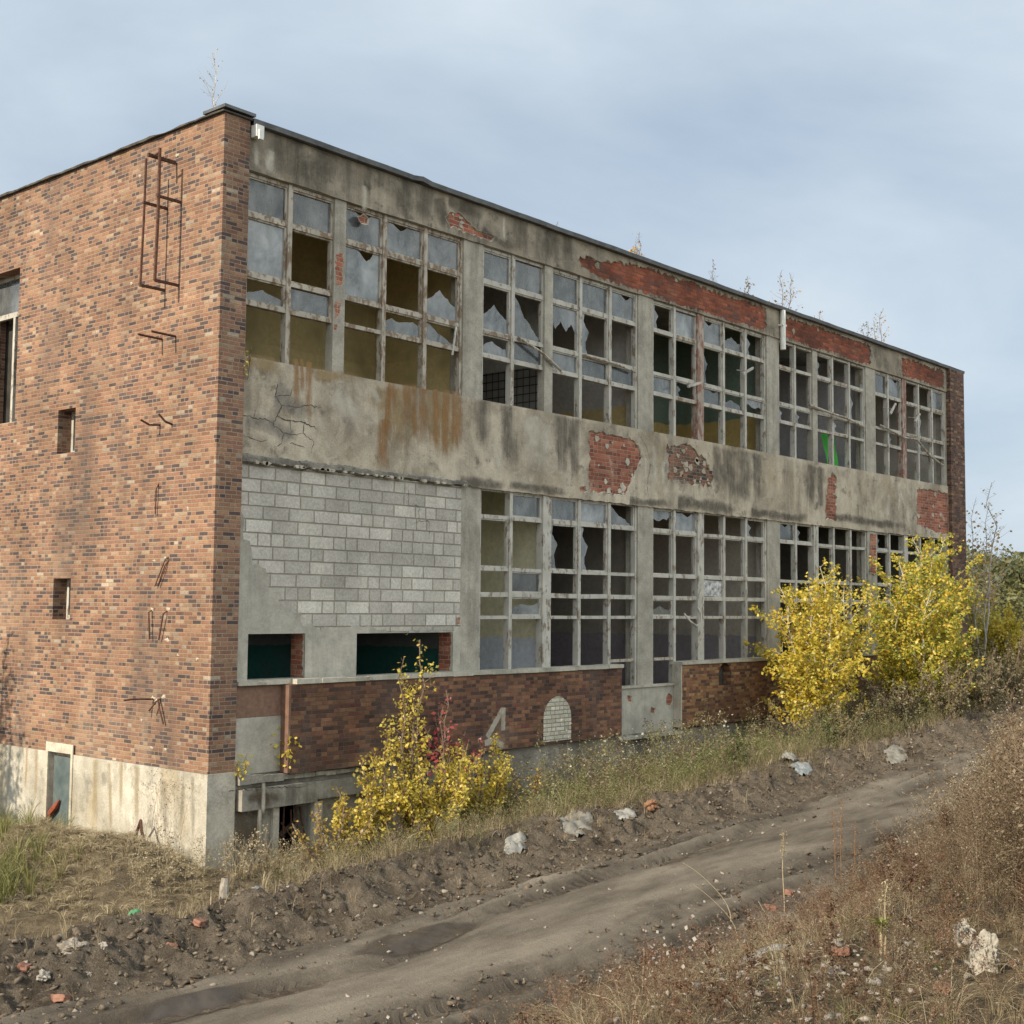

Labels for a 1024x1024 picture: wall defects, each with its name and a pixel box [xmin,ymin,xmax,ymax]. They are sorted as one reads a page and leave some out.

spalling [445,211,495,242]
spalling [578,255,768,333]
spalling [786,316,872,366]
spalling [901,357,945,389]
crack [243,384,322,453]
spalling [242,453,468,487]
spalling [579,429,643,497]
spalling [666,442,715,489]
spalling [825,472,838,522]
spalling [917,488,949,535]